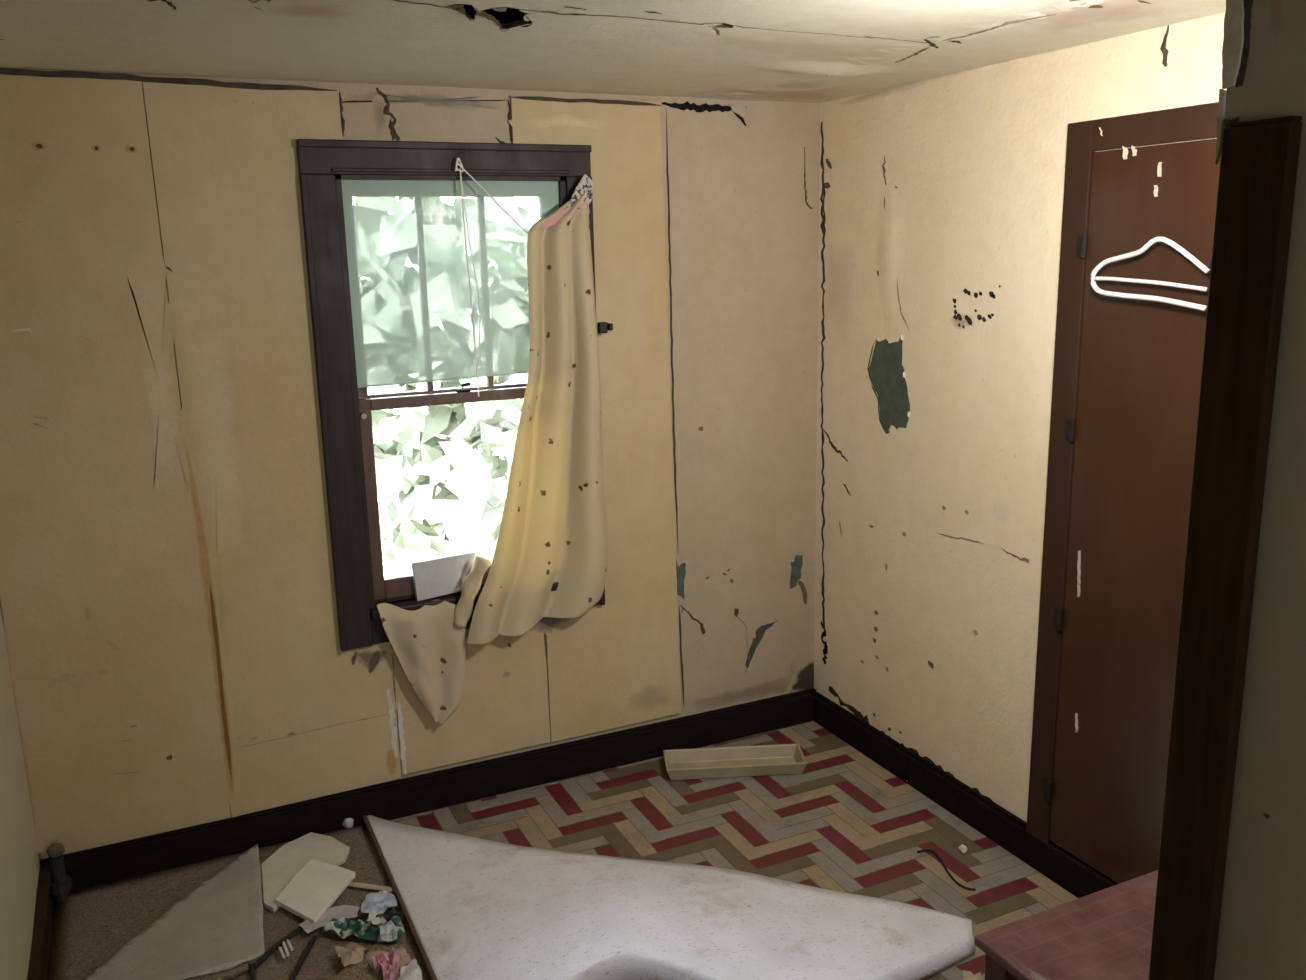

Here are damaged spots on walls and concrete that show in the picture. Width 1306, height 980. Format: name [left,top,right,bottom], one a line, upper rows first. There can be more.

crack [148,0,176,10]
crack [540,2,1087,63]
crack [1160,25,1169,67]
crack [338,91,346,136]
crack [376,87,400,141]
crack [804,121,851,664]
peeling [869,334,911,434]
peeling [676,557,687,601]
spalling [734,609,778,671]